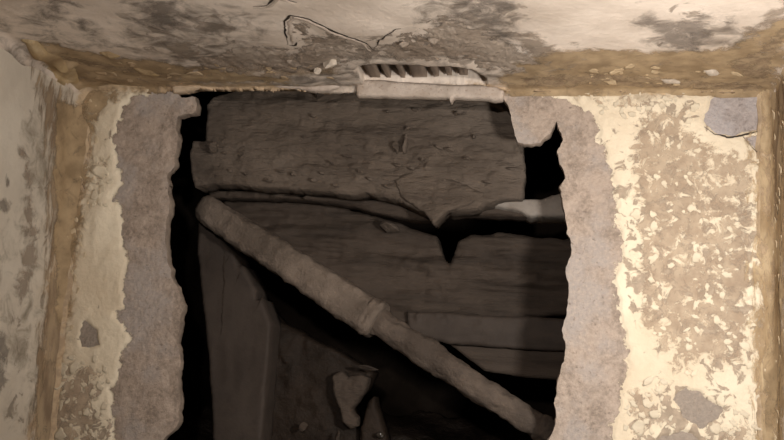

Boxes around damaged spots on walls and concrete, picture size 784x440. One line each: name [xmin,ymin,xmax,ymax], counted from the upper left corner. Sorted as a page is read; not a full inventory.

water stain [132,1,188,30]
crack [253,0,401,51]
water stain [501,32,553,57]
water stain [636,17,709,50]
water stain [746,8,784,37]
water stain [19,149,38,299]
flaking render [54,91,231,440]
flaking render [348,64,769,440]
spalling [242,253,509,425]